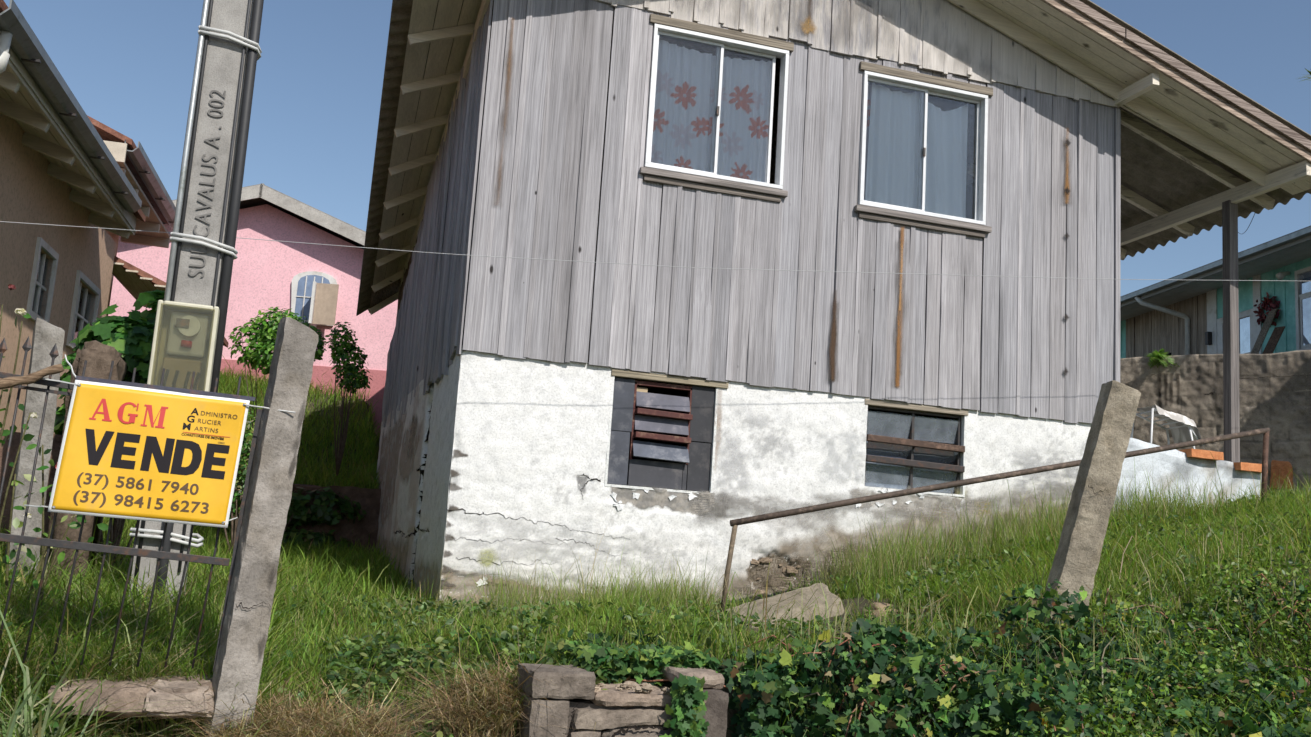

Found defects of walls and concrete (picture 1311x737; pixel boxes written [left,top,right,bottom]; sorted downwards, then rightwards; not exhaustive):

crack [393,404,625,582]
flaking render [610,487,727,519]